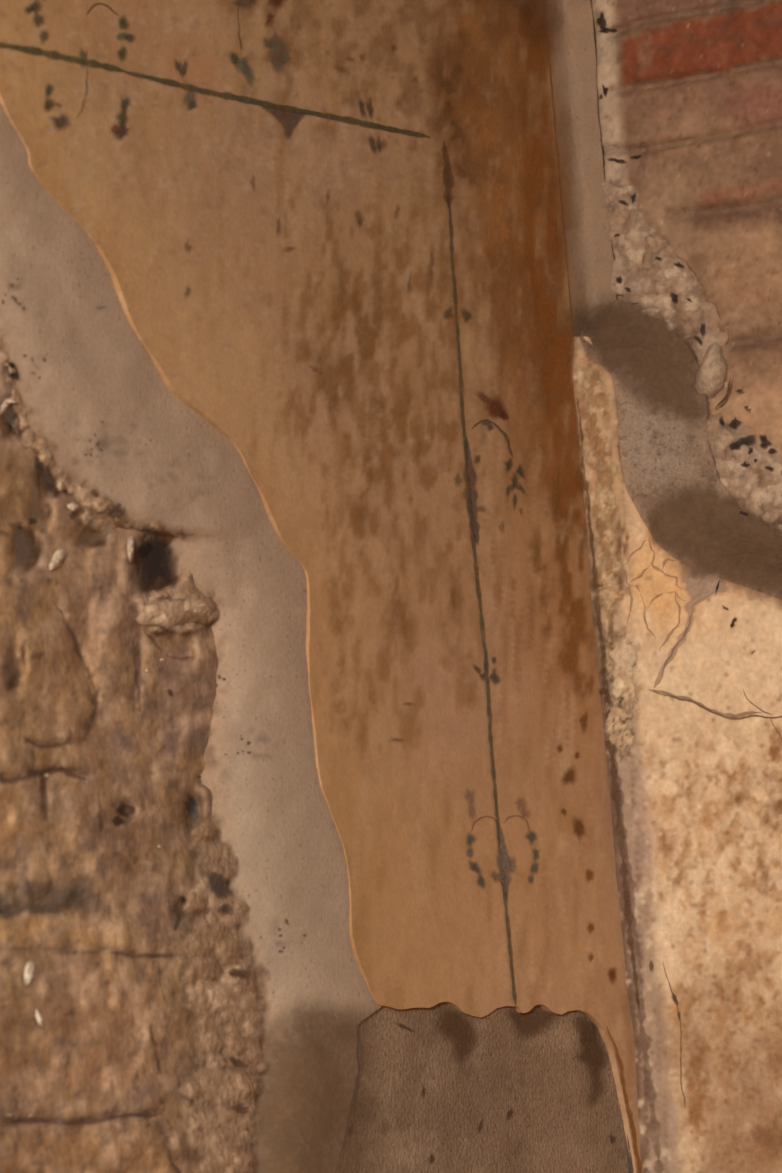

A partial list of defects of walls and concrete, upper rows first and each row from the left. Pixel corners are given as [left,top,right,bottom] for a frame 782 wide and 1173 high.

spalling [597,13,617,33]
spalling [0,339,183,592]
flaking render [581,369,626,618]
flaking render [602,181,782,532]
spalling [112,804,134,825]
flaking render [606,629,641,752]
crack [577,396,782,1127]
spalling [173,797,266,1173]